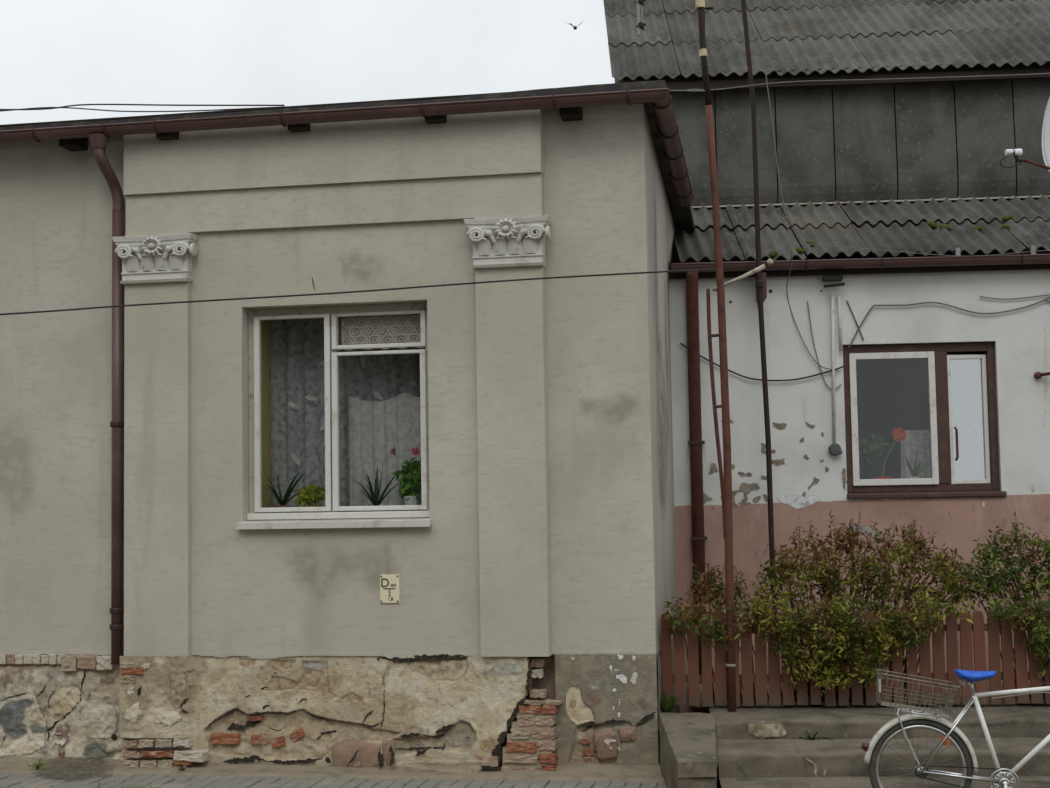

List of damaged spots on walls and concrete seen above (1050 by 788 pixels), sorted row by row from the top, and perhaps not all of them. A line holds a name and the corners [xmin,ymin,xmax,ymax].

peeling [703,464,768,507]
peeling [761,443,785,466]
peeling [800,422,829,497]
flaking render [0,654,476,770]
flaking render [501,655,641,771]